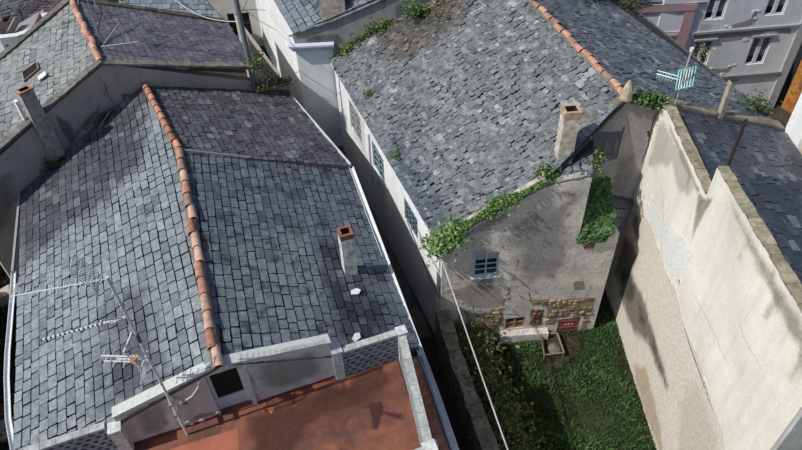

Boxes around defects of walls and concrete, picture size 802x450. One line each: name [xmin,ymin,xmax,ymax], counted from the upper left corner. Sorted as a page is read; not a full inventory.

water stain [616,239,665,381]
flaking render [607,199,724,450]
water stain [749,245,802,343]
water stain [252,377,402,450]